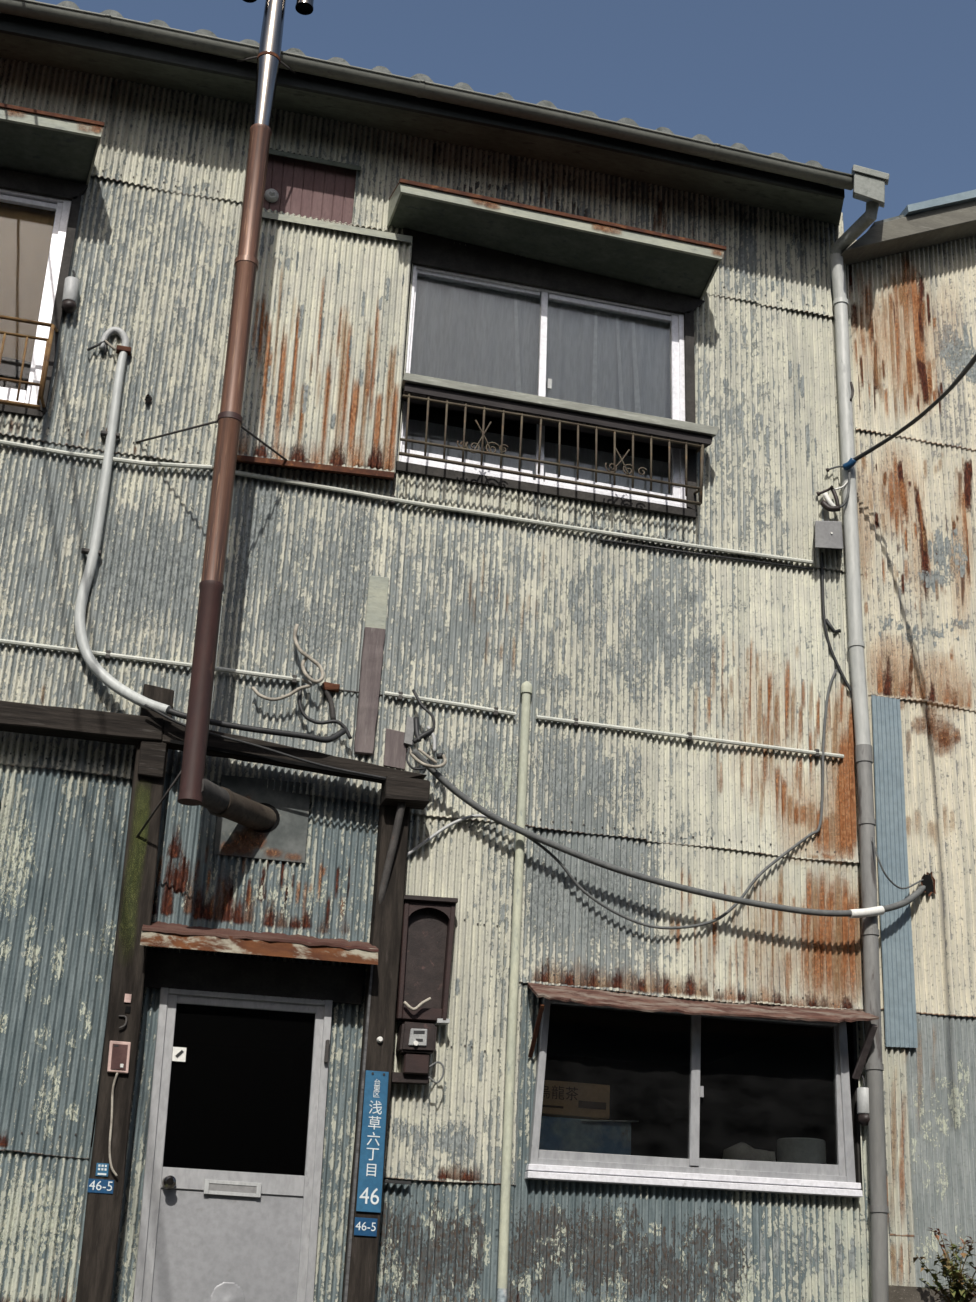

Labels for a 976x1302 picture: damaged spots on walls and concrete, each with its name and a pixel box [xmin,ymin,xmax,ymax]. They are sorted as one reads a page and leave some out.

rust [238,288,398,471]
rust [849,255,943,412]
rust [862,458,937,606]
rust [946,460,973,602]
rust [749,650,857,859]
rust [877,647,970,752]
peeling [0,803,116,1005]
rust [152,827,350,933]
rust [533,875,861,1010]
peeling [19,997,92,1139]